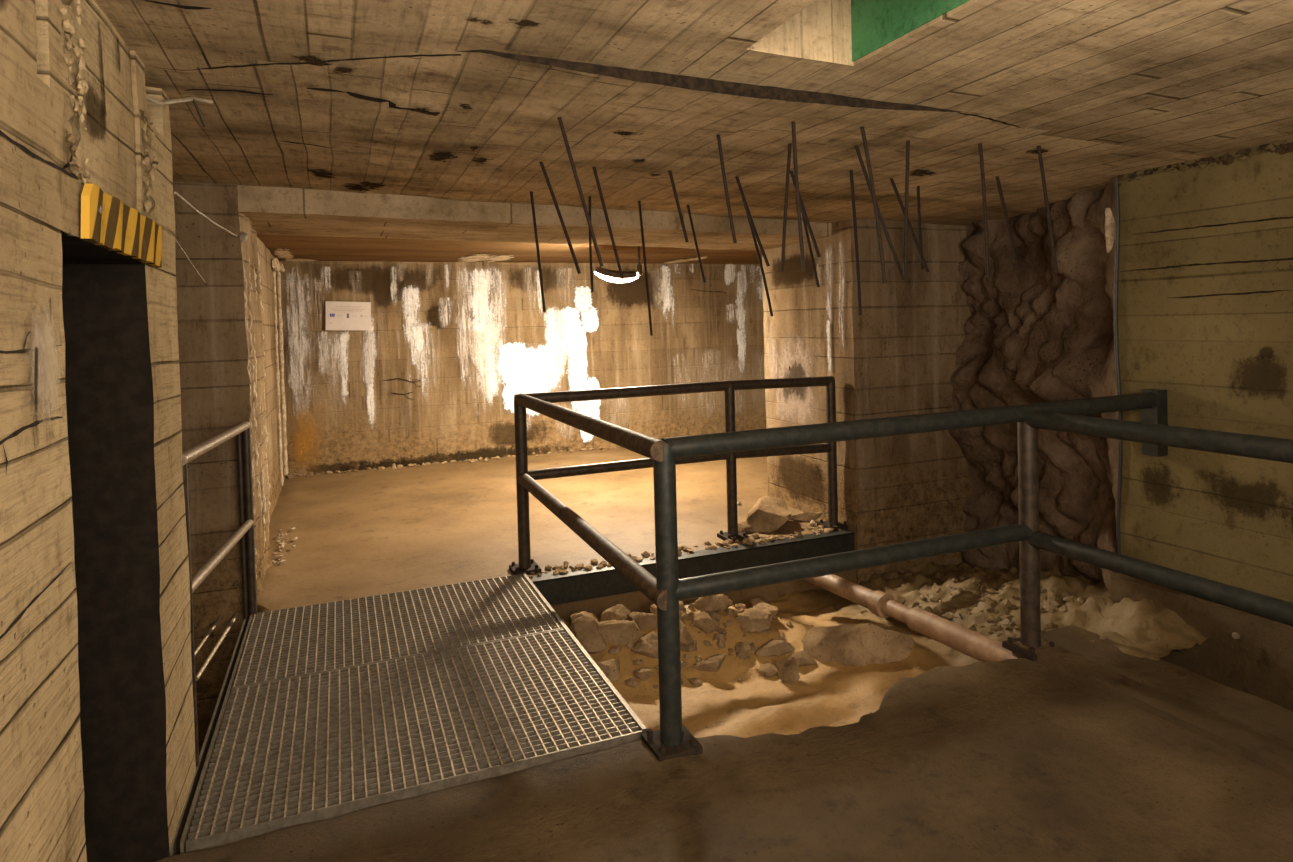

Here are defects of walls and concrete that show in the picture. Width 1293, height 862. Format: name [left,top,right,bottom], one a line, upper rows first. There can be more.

spalling [59,0,90,184]
spalling [140,109,159,220]
water stain [239,217,626,558]
spalling [530,117,625,312]
spalling [638,201,653,336]
water stain [608,256,706,319]
spalling [633,159,706,283]
spalling [717,121,821,316]
water stain [702,244,844,423]
spalling [849,126,937,315]